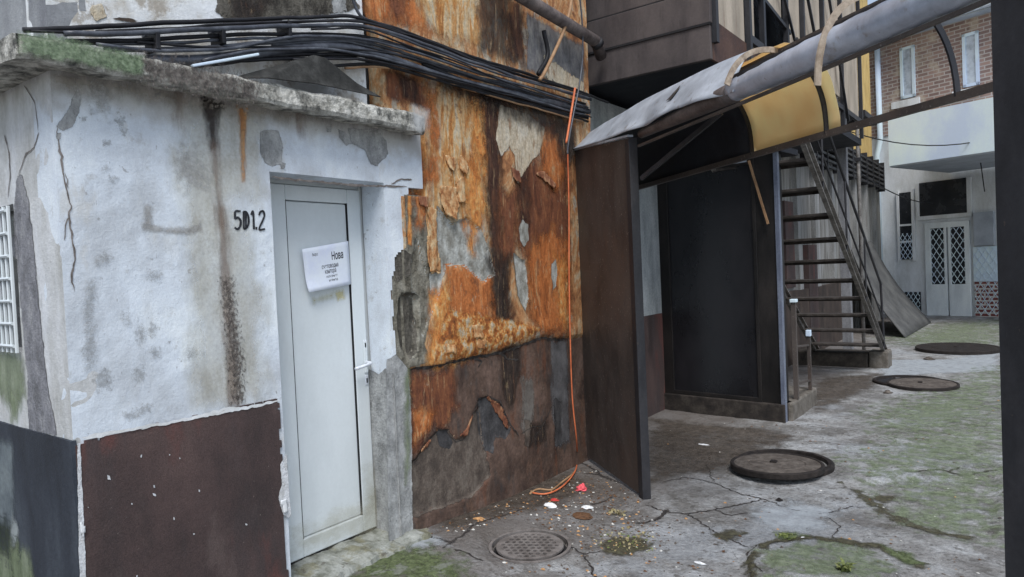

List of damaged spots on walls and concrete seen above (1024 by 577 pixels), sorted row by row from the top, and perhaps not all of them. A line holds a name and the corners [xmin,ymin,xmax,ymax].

corrosion [366,0,479,46]
crack [4,86,76,292]
peeling [56,89,81,139]
water stain [58,48,323,404]
corrosion [237,106,248,181]
peeling [260,130,286,169]
peeling [327,126,388,166]
corrosion [386,71,574,455]
flaking render [496,105,556,188]
peeling [368,155,511,541]
crack [915,467,997,476]
crack [637,468,859,574]